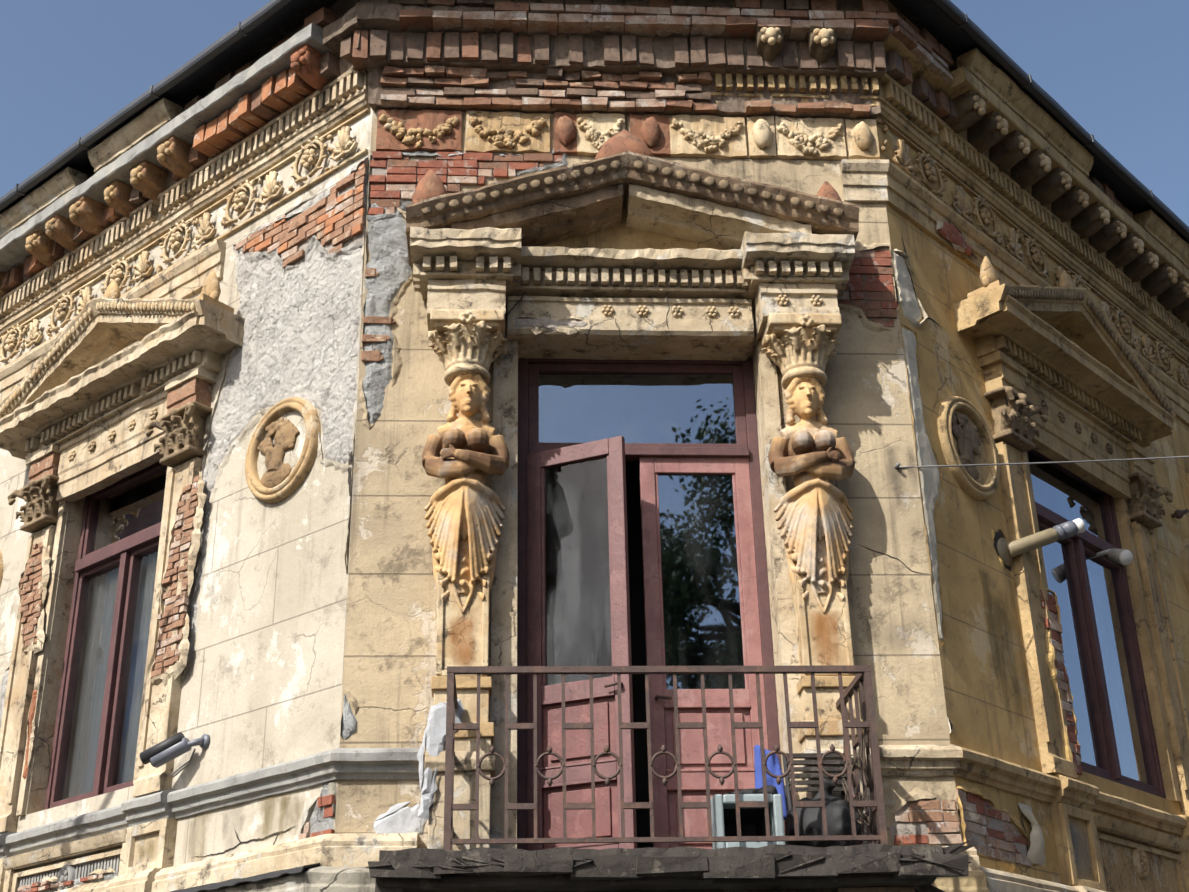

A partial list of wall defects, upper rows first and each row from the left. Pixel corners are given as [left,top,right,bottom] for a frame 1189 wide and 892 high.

spalling [151,149,568,686]
flaking render [837,243,946,646]
flaking render [18,538,51,655]
spalling [0,665,10,728]
flaking render [1039,588,1083,780]
crack [195,826,296,857]
peeling [373,699,464,835]
flaking render [890,785,1032,874]